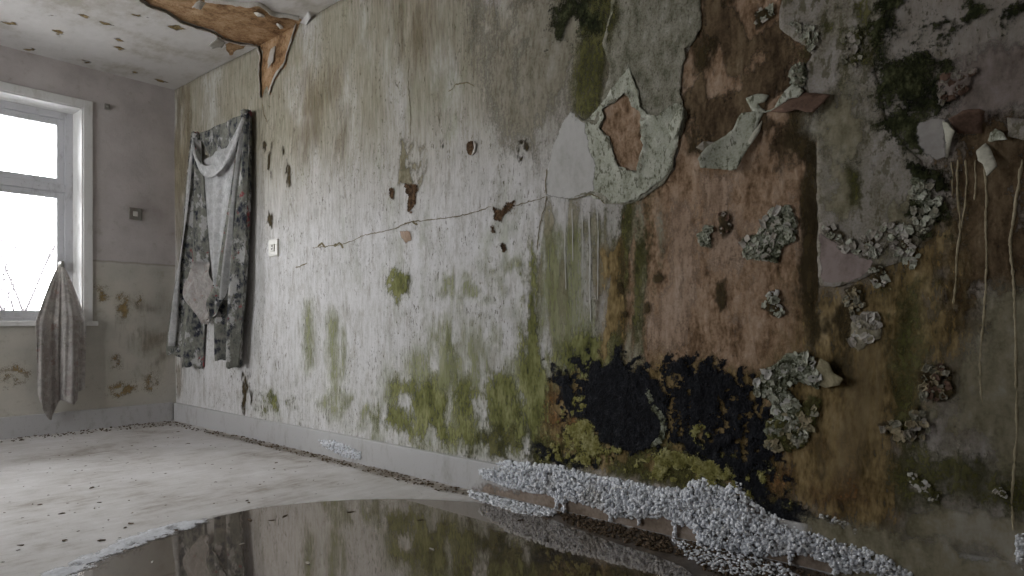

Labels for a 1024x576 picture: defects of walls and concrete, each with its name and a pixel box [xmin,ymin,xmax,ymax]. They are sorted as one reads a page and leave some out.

spalling [132,0,311,122]
crack [296,207,488,268]
peeling [389,139,425,214]
spalling [490,200,515,253]
crack [516,169,547,249]
flaking render [545,0,1024,454]
leakage [94,284,141,319]
leakage [470,0,1024,576]
leakage [109,375,158,398]